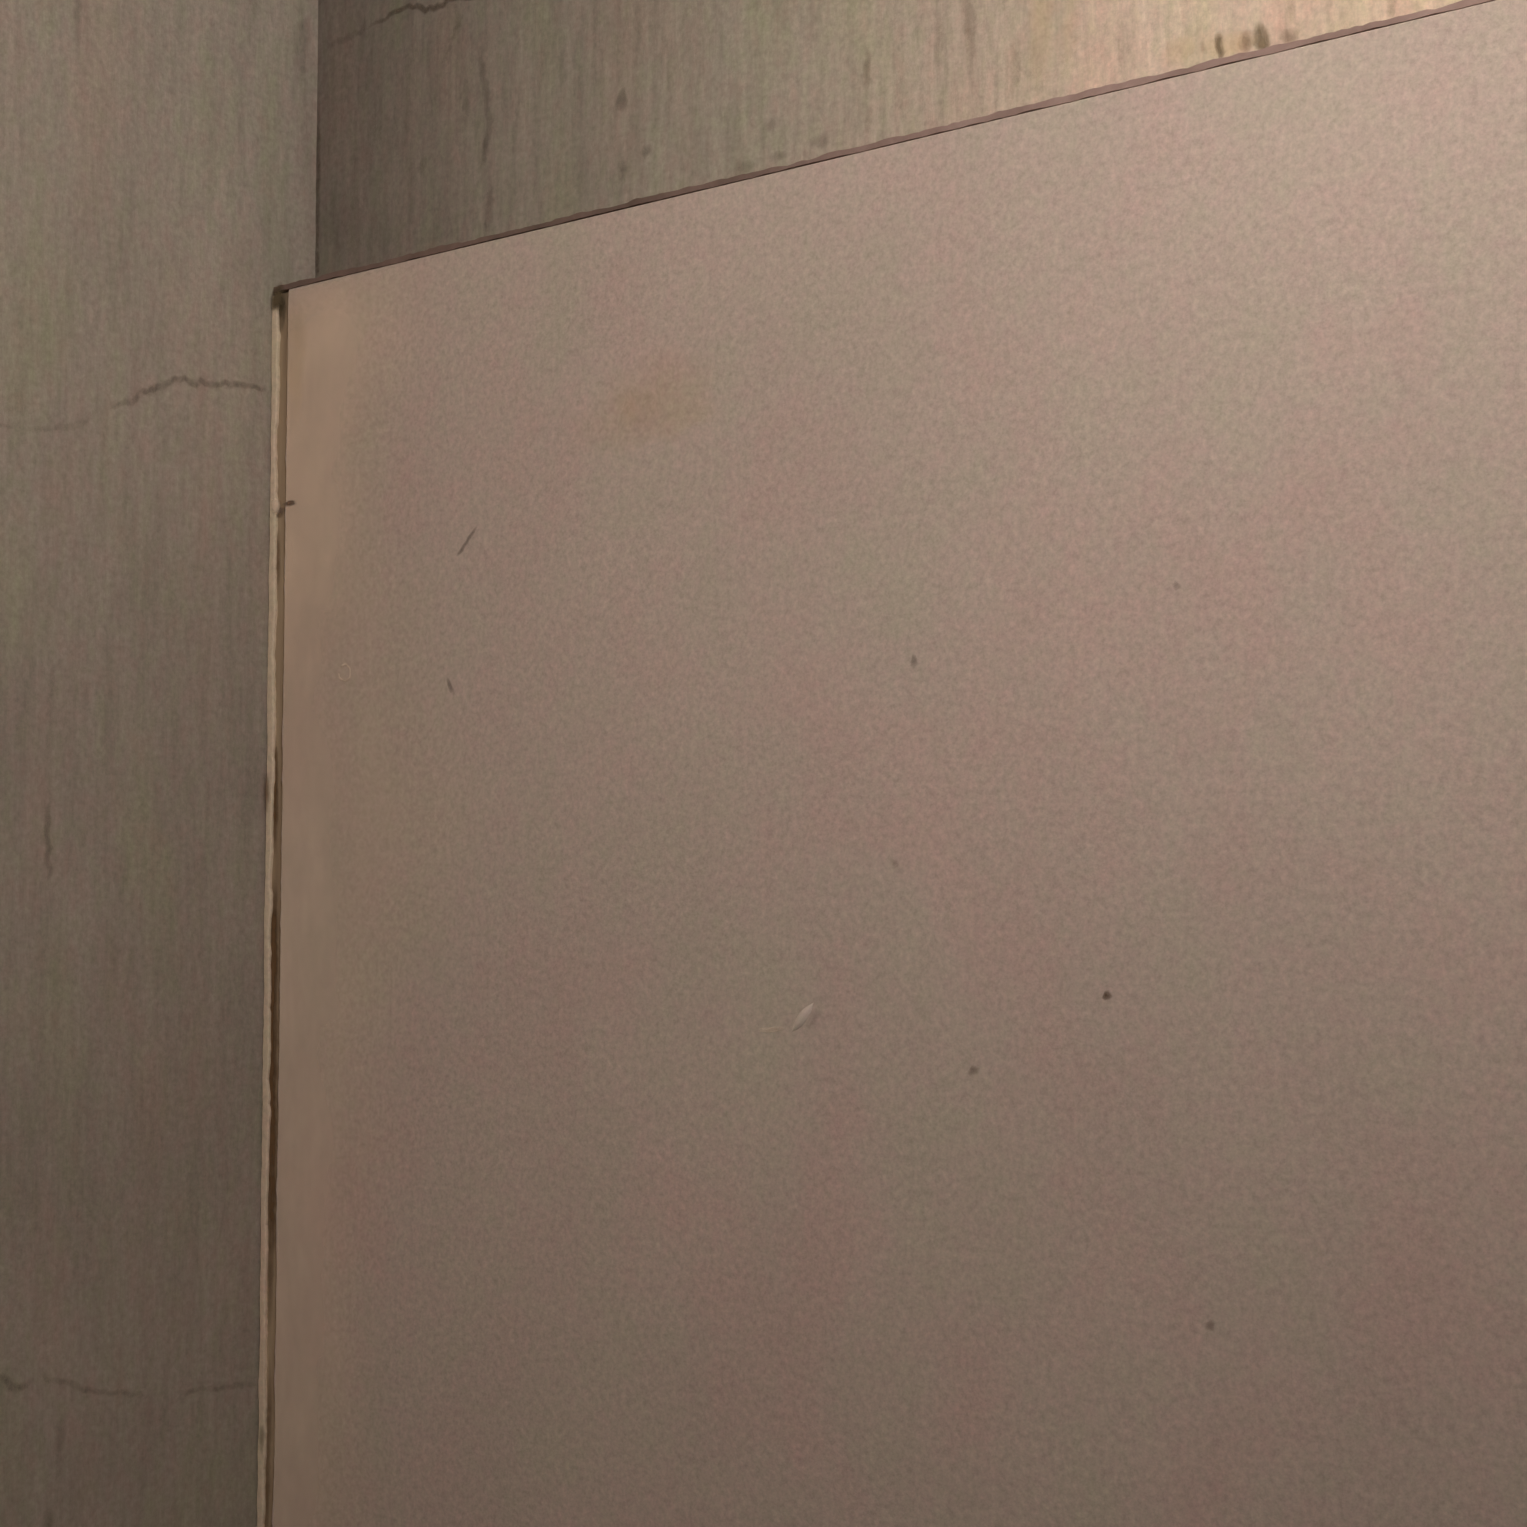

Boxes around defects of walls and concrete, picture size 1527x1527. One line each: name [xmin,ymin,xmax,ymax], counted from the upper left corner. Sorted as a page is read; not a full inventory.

crack [389,2,446,15]